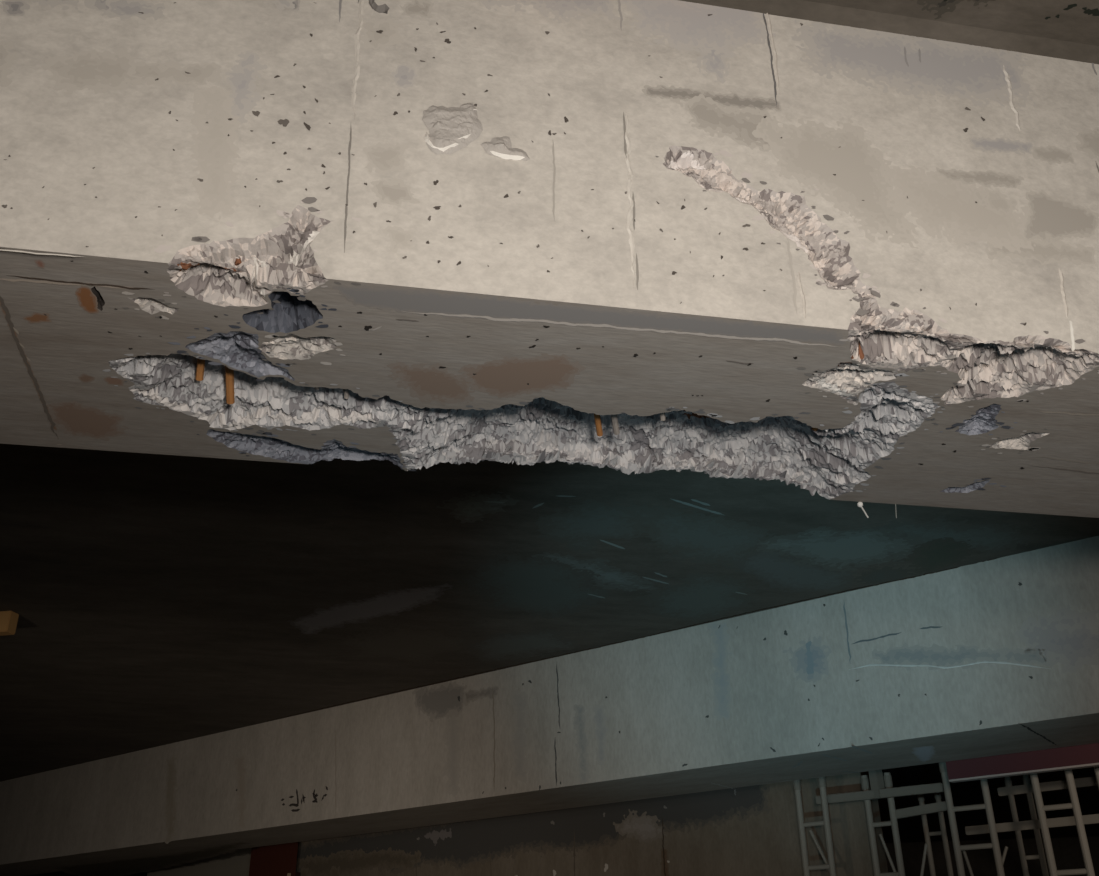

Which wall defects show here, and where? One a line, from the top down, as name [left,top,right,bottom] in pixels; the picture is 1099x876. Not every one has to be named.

spalling [369,0,390,14]
damp [356,0,434,55]
damp [476,0,1099,265]
damp [363,142,420,207]
corrosion [75,286,99,314]
spalling [91,287,105,311]
spalling [103,151,1099,499]